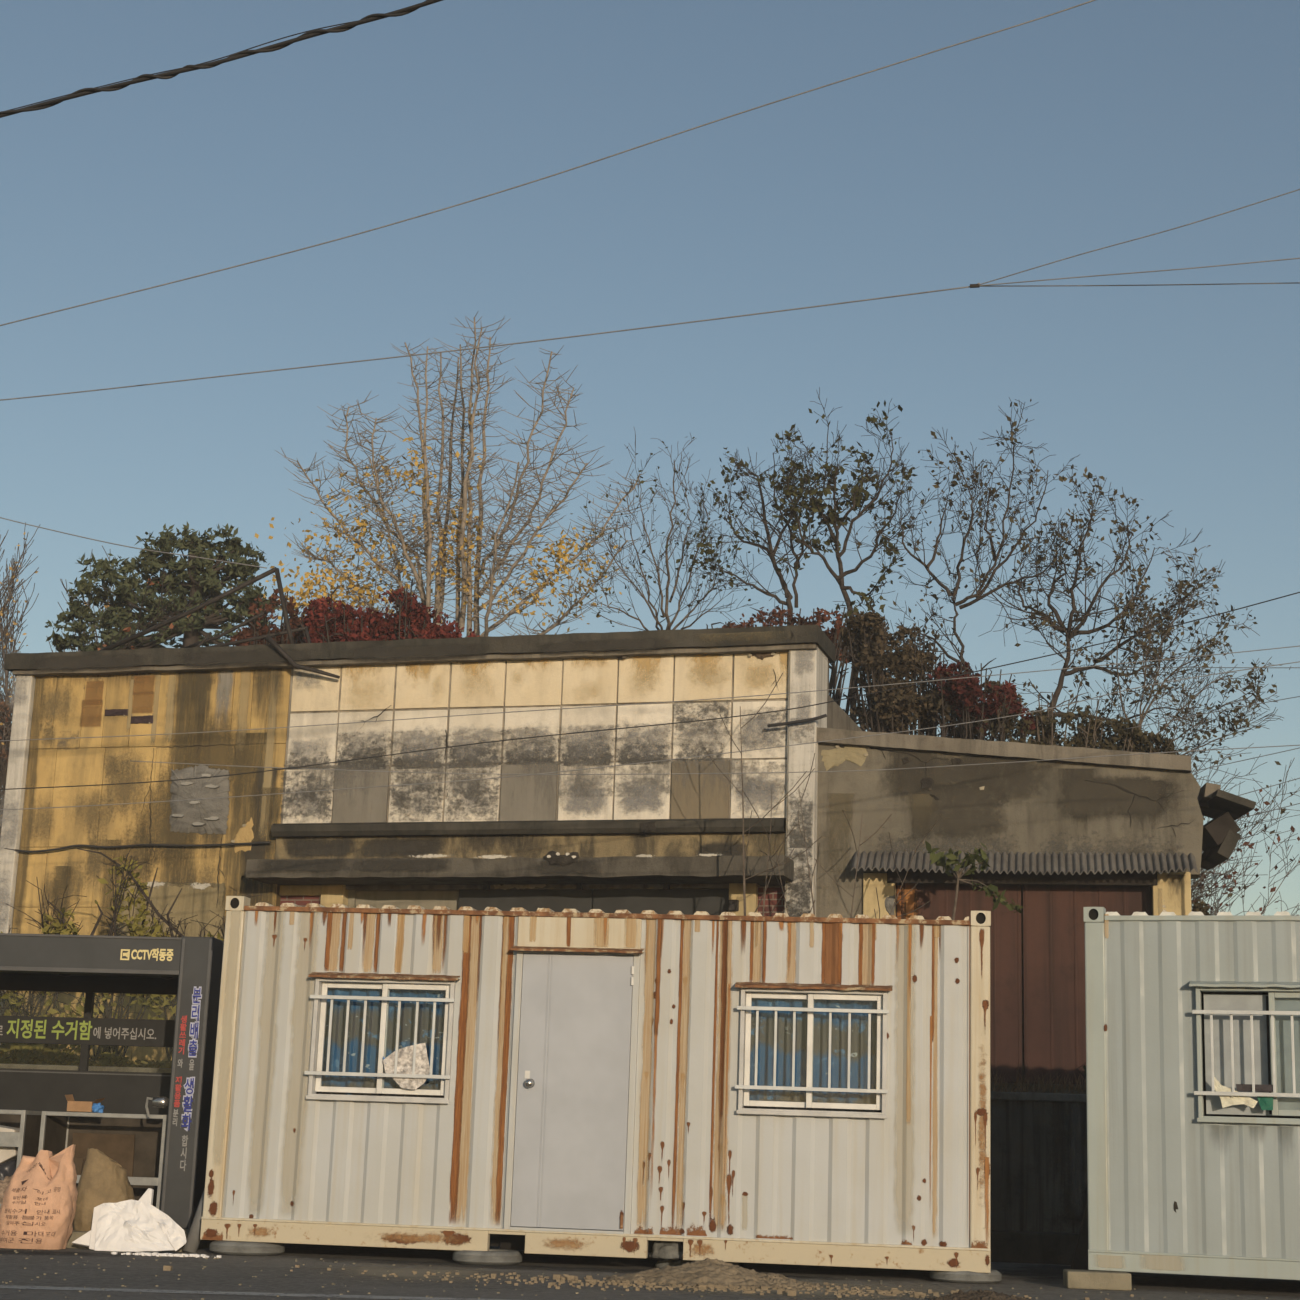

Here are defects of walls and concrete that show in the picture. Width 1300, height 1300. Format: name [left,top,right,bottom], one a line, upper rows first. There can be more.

damp [525,639,666,671]
damp [0,654,145,934]
damp [43,644,812,936]
damp [874,750,1043,855]
damp [1061,768,1173,822]
damp [1169,874,1185,915]
corrosion [272,911,294,946]
corrosion [304,912,405,972]
corrosion [858,923,876,985]
corrosion [381,914,482,1245]
corrosion [596,918,842,1256]
corrosion [547,1239,583,1249]